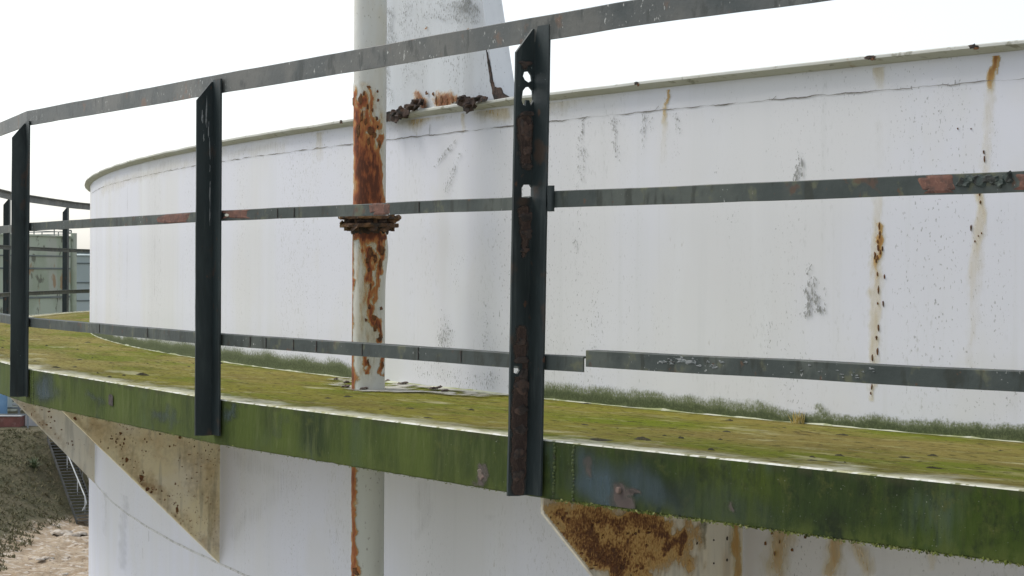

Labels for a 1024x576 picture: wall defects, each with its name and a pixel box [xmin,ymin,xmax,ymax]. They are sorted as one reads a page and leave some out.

crack [549,78,1024,122]
corrosion [987,55,1000,88]
crack [386,125,514,140]
corrosion [516,111,534,170]
peeling [917,170,1024,193]
corrosion [339,84,488,343]
corrosion [873,222,885,307]
corrosion [352,356,384,390]
corrosion [510,325,529,495]
corrosion [351,467,361,576]
corrosion [543,483,741,576]